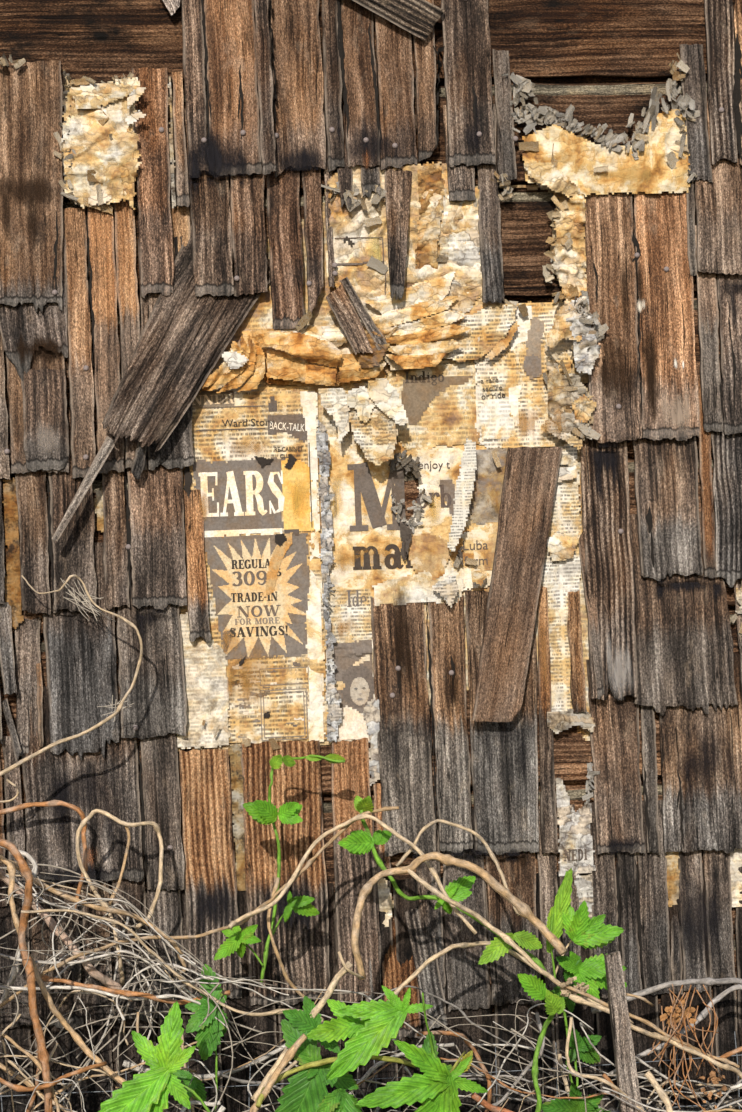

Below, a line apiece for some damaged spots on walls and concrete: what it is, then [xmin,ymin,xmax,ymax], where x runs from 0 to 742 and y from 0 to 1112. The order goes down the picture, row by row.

leakage [188,136,246,193]
leakage [278,136,319,173]